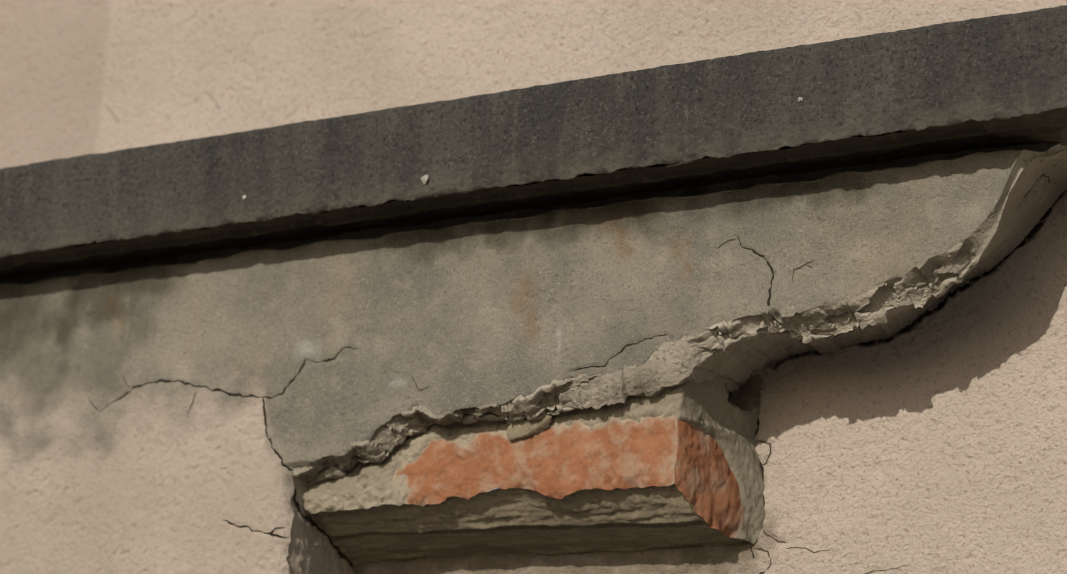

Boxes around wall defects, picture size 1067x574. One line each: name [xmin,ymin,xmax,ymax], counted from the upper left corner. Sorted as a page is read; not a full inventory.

crack [718,236,813,306]
flaking render [767,203,1003,339]
crack [858,174,1061,345]
crack [88,346,358,567]
peeling [292,332,709,514]
crack [750,411,828,574]